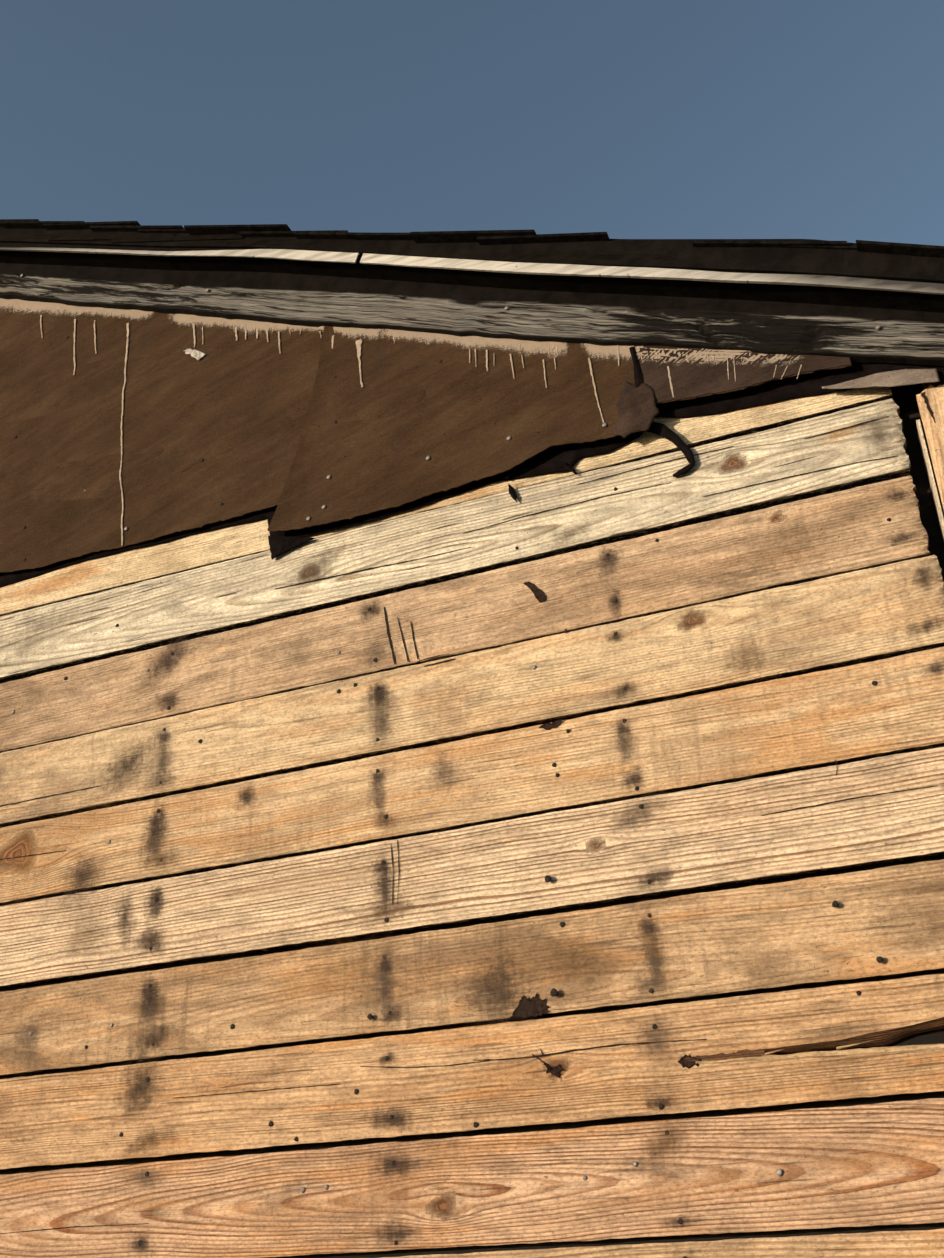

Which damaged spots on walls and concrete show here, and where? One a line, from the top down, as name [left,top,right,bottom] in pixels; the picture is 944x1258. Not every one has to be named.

spalling [523,581,546,602]
damp [111,751,139,779]